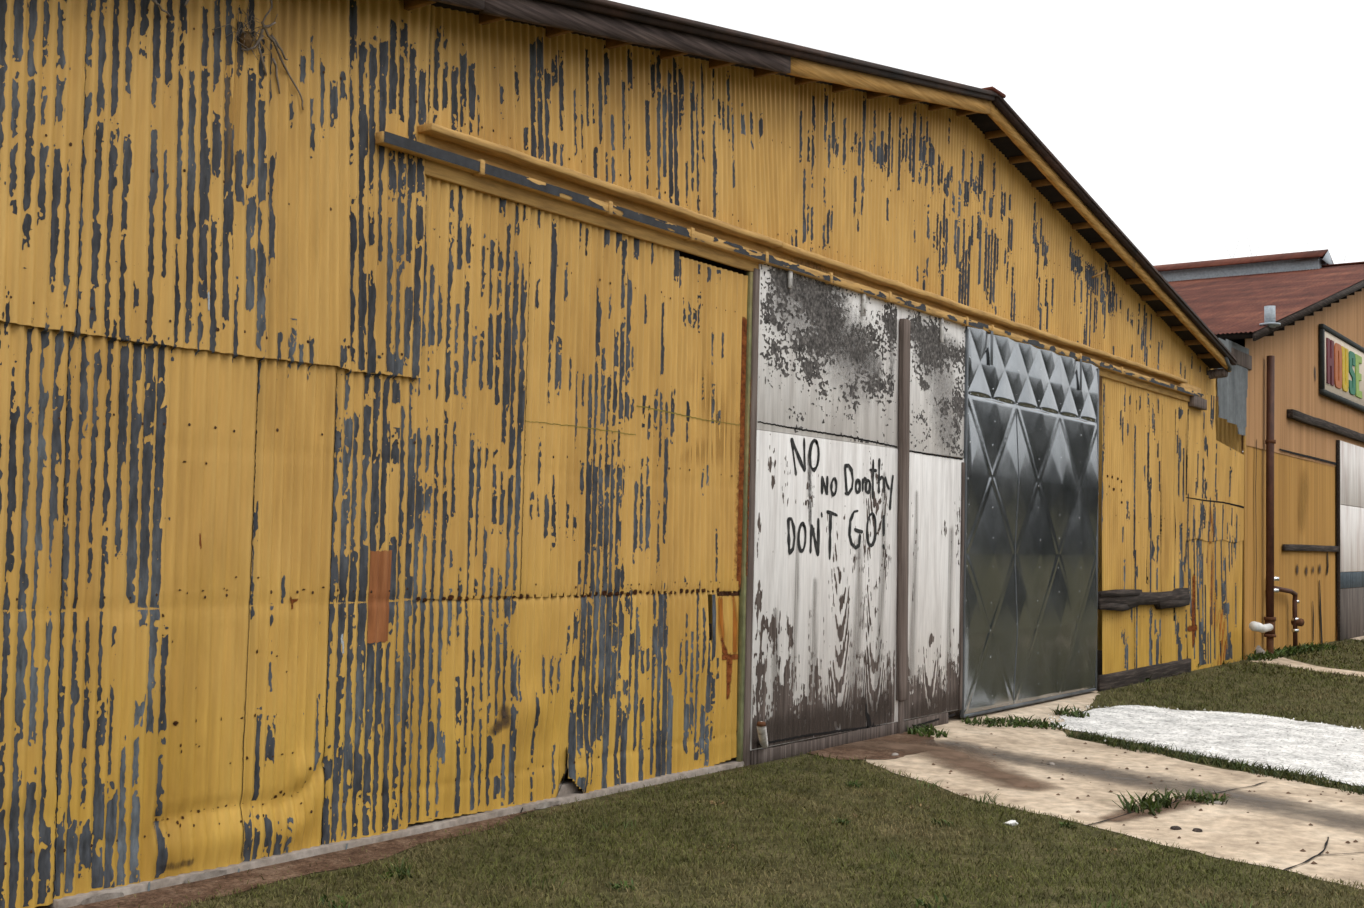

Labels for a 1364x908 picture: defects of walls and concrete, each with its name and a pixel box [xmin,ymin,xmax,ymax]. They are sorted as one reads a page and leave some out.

peeling [0,0,314,908]
peeling [289,0,841,844]
damp [795,570,816,664]
damp [753,684,892,742]
peeling [752,434,959,749]
damp [760,264,965,456]
peeling [791,88,1238,670]